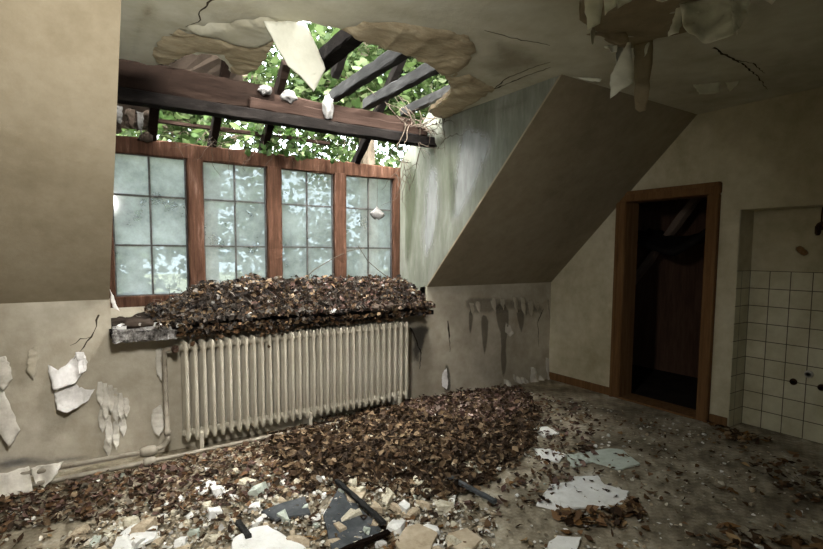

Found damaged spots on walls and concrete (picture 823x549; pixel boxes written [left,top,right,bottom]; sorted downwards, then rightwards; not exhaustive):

crack [186,0,213,27]
flaking render [152,17,283,75]
flaking render [342,21,495,118]
crack [713,47,767,89]
crack [70,315,100,359]
leakage [469,304,524,374]
peeling [0,356,20,446]
peeling [48,352,130,456]